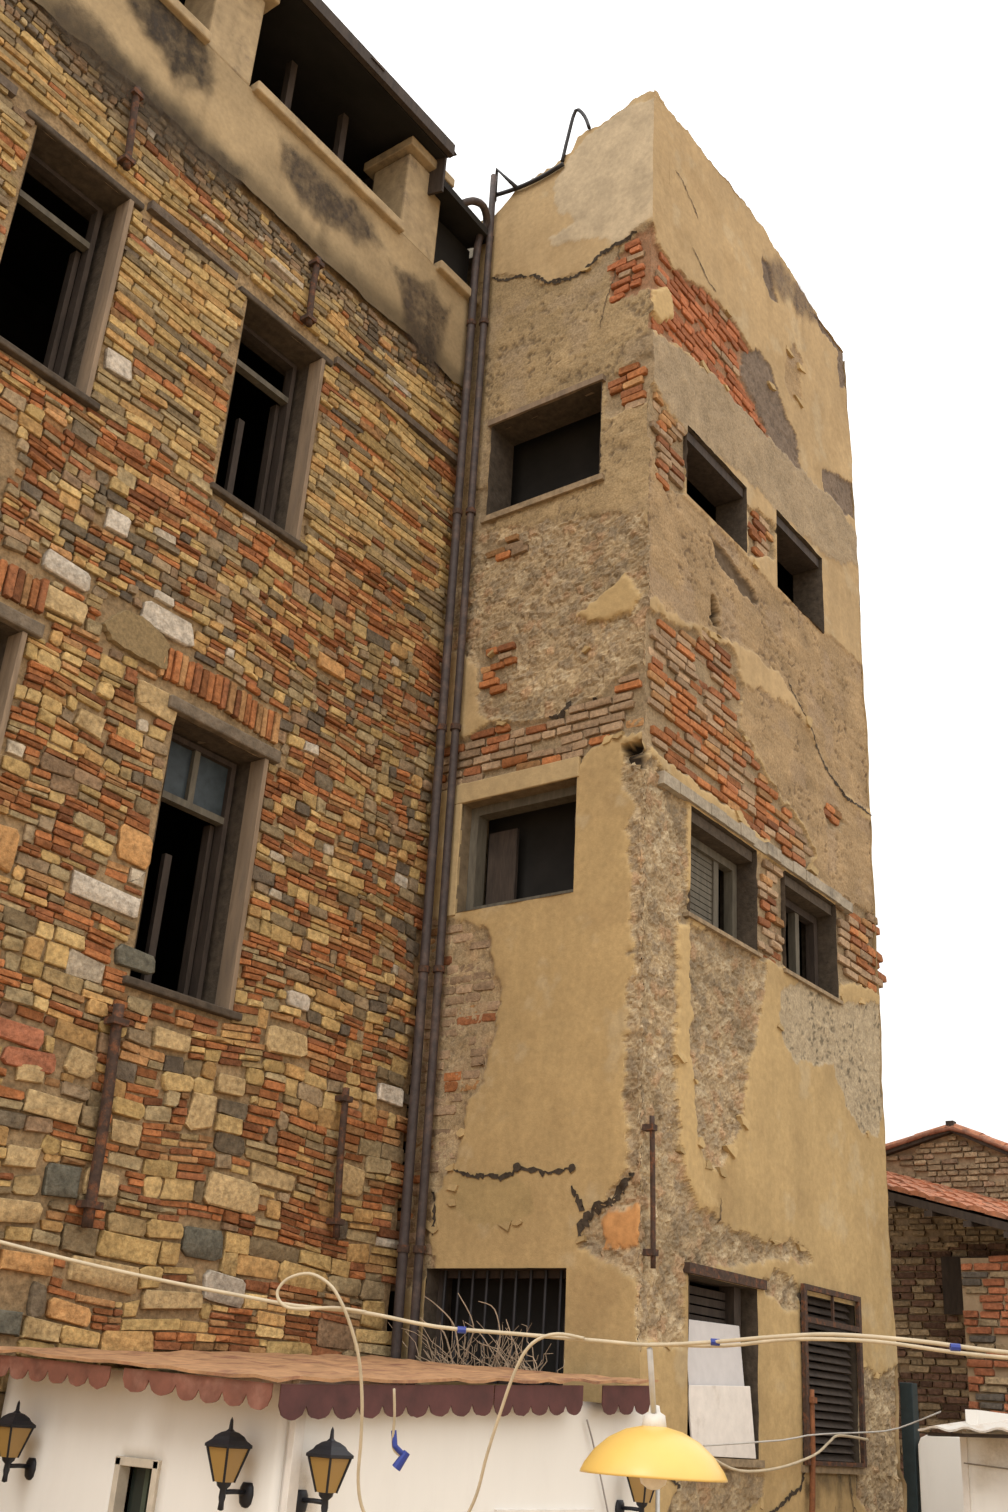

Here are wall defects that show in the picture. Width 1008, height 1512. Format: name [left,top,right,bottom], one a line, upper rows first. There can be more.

leakage [287,150,371,238]
spalling [442,97,887,1350]
spalling [390,916,534,1291]
crack [431,1162,635,1237]
spalling [961,1255,1008,1414]
spalling [667,1458,766,1512]
spalling [855,1360,904,1512]